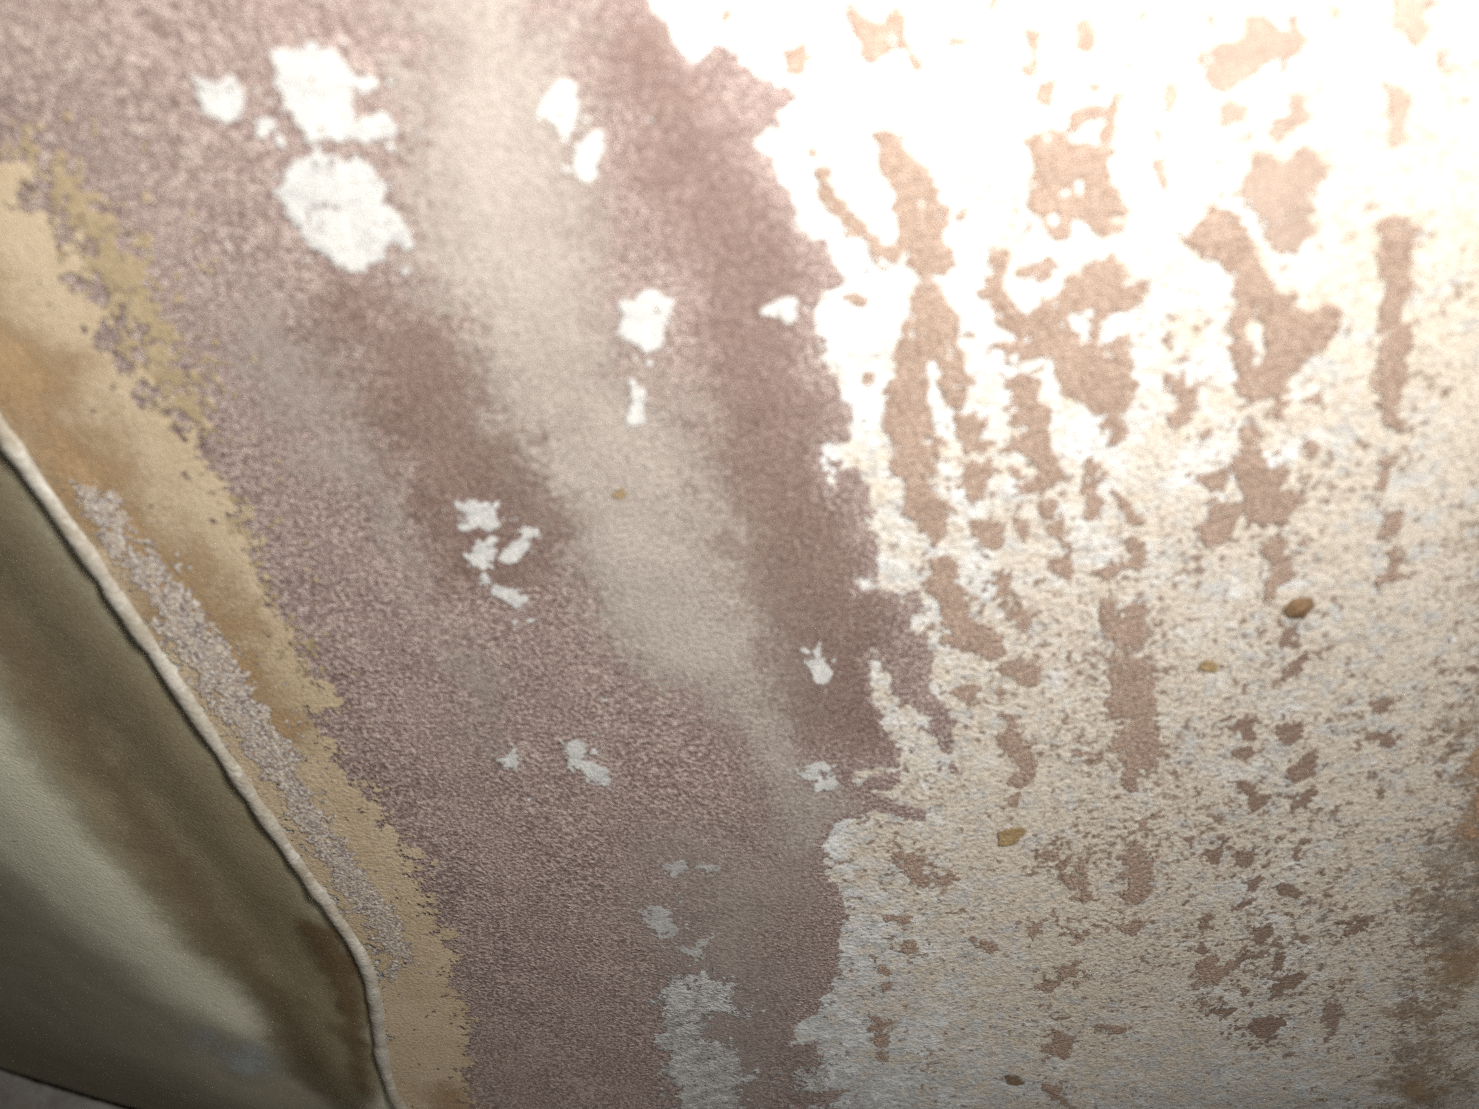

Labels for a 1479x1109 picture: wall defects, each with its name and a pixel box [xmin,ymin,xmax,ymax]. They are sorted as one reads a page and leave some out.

peeling [191,28,415,275]
peeling [534,78,606,183]
peeling [616,288,674,430]
peeling [761,288,799,324]
peeling [185,459,358,689]
peeling [443,498,542,626]
peeling [800,642,840,692]
peeling [494,743,520,770]
peeling [555,732,617,790]
peeling [787,761,847,793]
corrosion [1372,711,1479,1109]
peeling [636,859,867,1109]